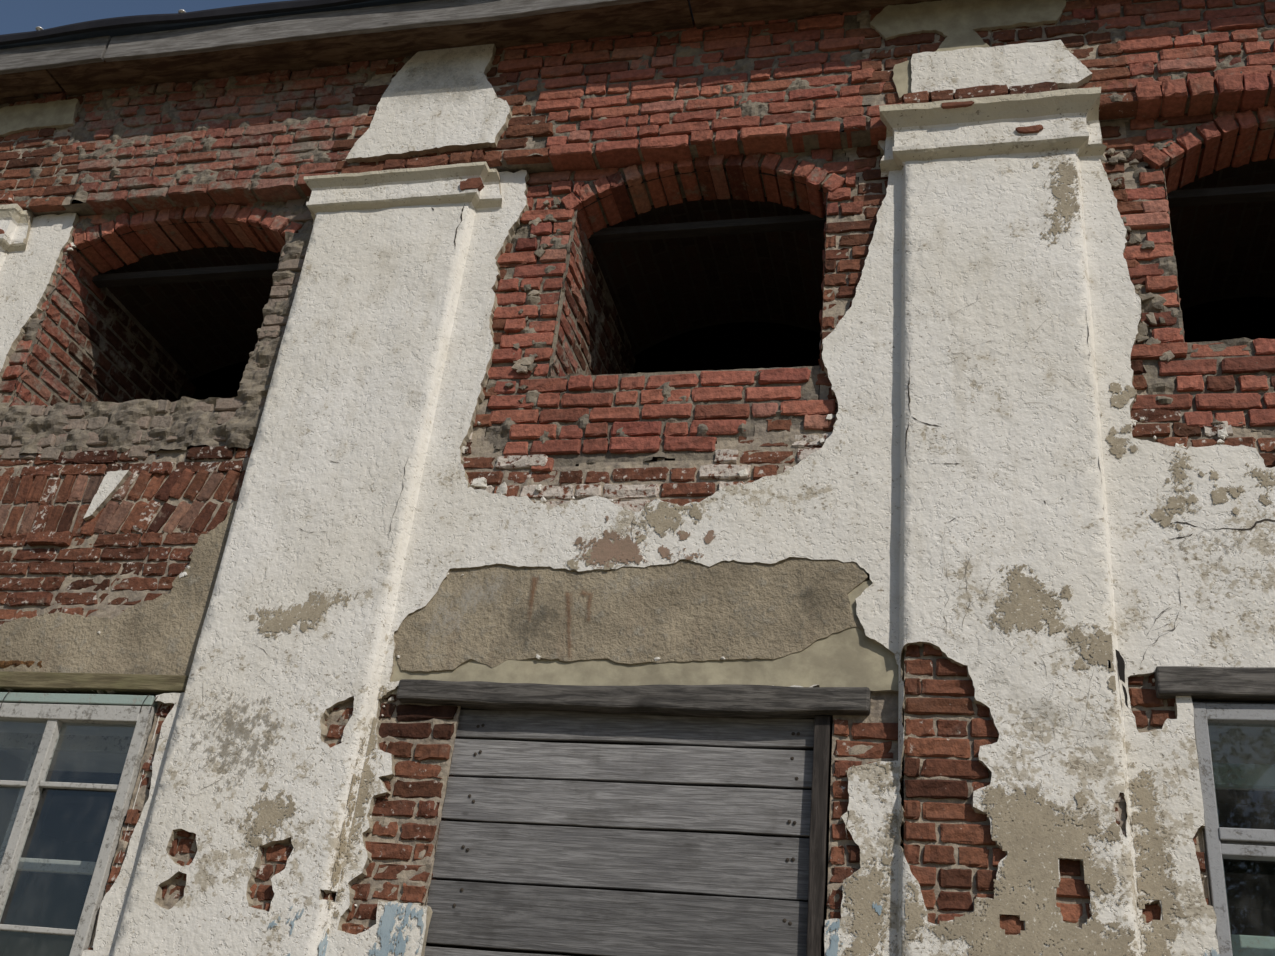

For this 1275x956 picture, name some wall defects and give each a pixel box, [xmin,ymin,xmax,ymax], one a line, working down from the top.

spalling [1100,120,1175,362]
spalling [0,446,252,675]
peeling [243,589,359,639]
peeling [394,145,888,672]
peeling [987,564,1176,733]
spalling [1101,360,1275,569]
crack [1141,519,1275,662]
spalling [159,830,197,909]
spalling [239,780,300,928]
spalling [322,685,461,934]
spalling [827,644,1191,956]